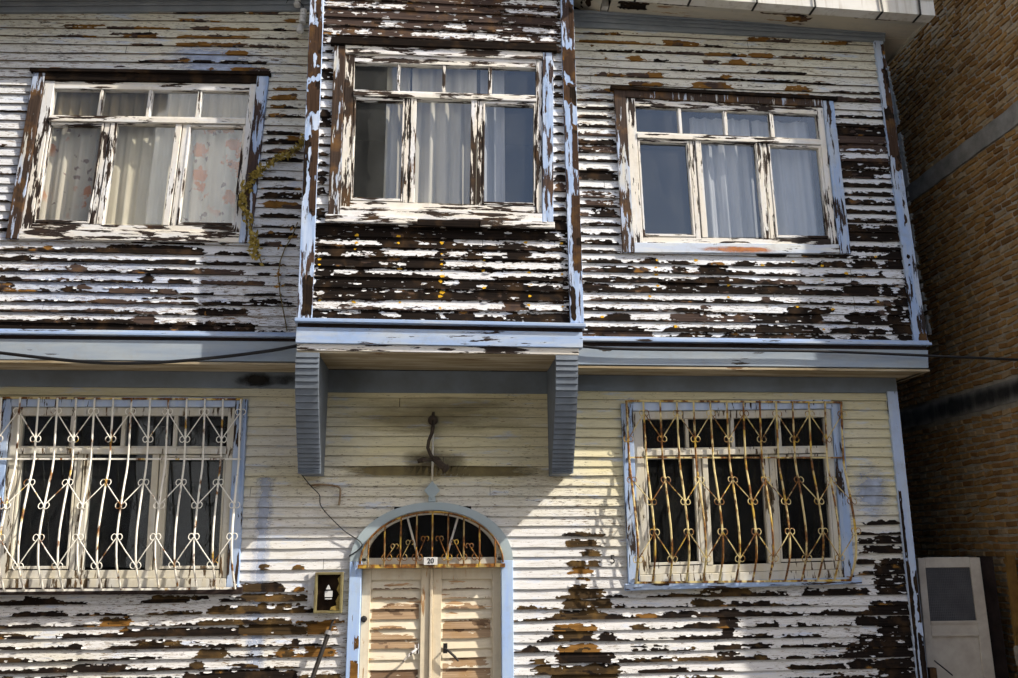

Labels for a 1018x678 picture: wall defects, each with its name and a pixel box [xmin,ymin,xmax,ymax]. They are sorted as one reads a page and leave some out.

peeling [0,0,927,341]
peeling [0,582,359,678]
peeling [371,588,419,649]
peeling [443,587,491,638]
peeling [513,490,928,678]
peeling [370,669,418,678]
peeling [442,657,491,678]